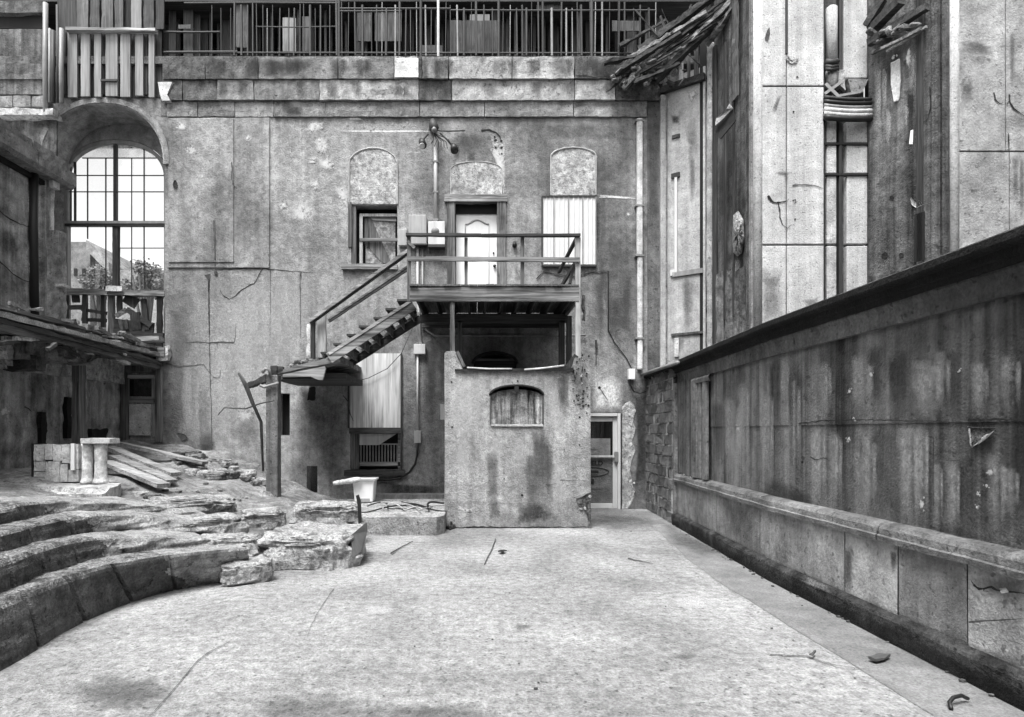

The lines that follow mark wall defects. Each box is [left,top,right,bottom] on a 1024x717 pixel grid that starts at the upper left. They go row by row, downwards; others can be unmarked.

crack [166,220,313,434]
spalling [967,427,996,448]
peeling [622,401,636,509]
water stain [522,505,548,520]
crack [971,581,1024,594]